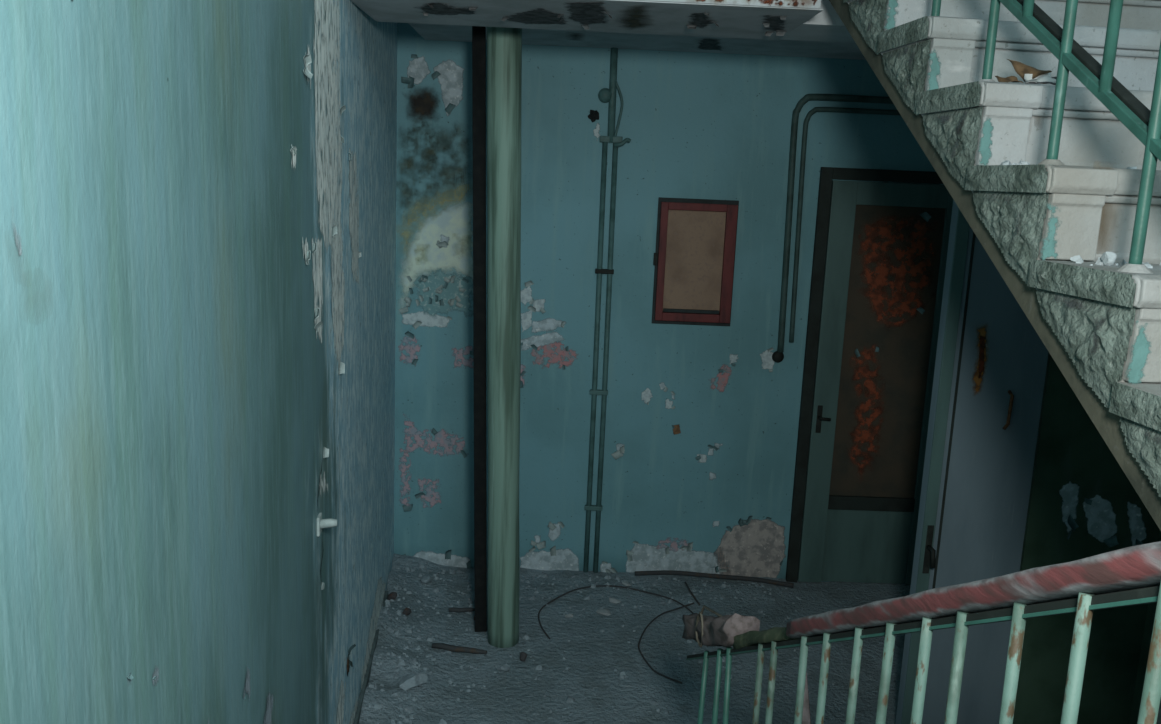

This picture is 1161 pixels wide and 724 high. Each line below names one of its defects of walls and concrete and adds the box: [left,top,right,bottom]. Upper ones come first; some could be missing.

leakage [409,90,437,118]
peeling [302,0,361,375]
peeling [399,202,473,368]
peeling [520,281,577,388]
spalling [843,0,1161,497]
peeling [399,420,467,512]
peeling [520,522,579,571]
peeling [1059,481,1147,548]